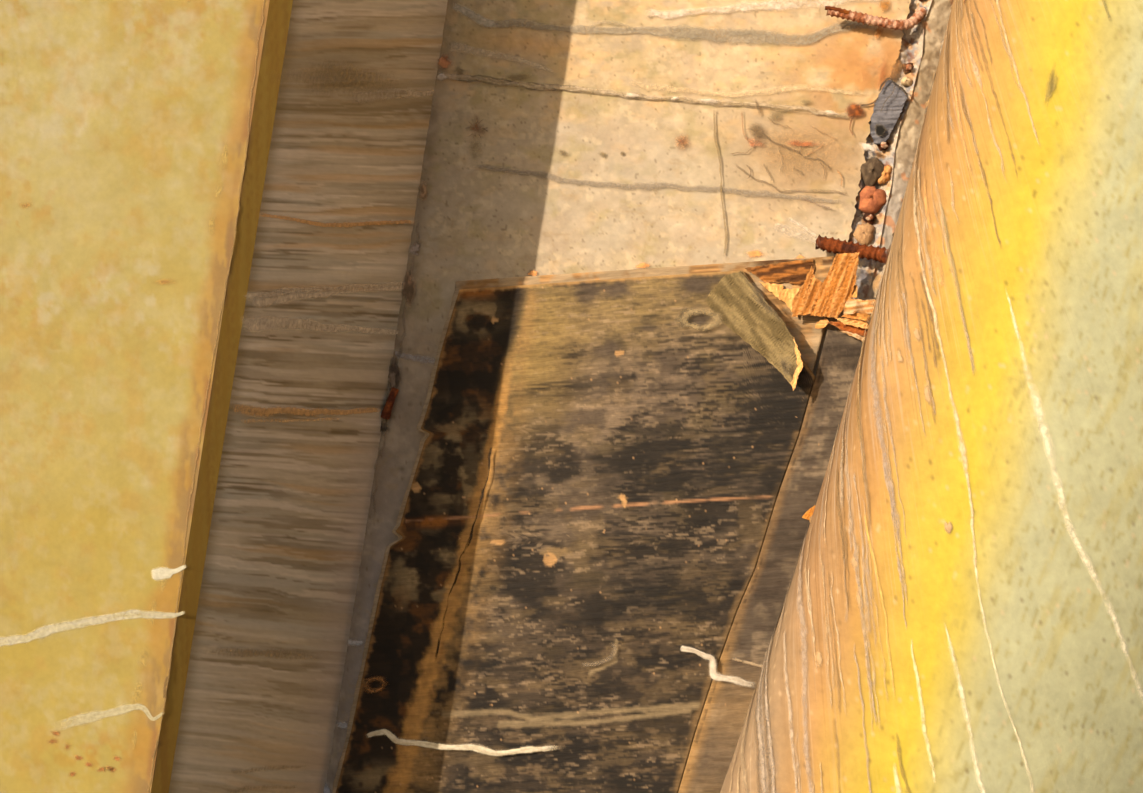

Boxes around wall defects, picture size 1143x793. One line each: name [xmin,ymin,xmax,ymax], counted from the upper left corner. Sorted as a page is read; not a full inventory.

water stain [454,0,868,45]
corrosion [846,98,878,135]
spalling [831,0,932,332]
crack [435,448,492,657]